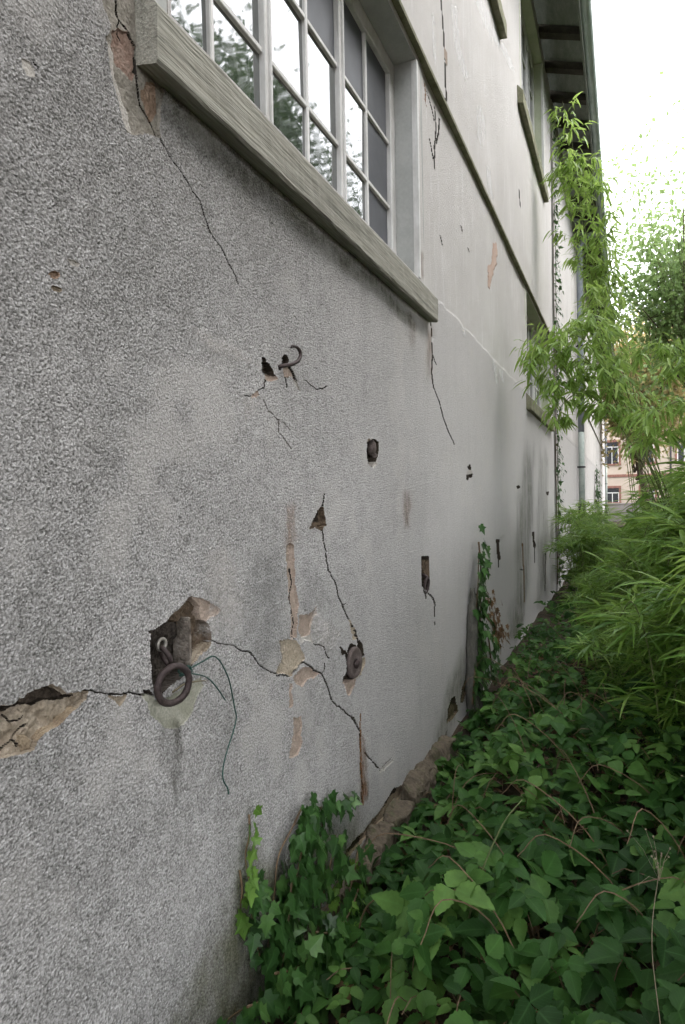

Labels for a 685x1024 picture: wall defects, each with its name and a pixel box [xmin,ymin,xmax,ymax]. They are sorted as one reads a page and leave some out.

spalling [102,0,164,138]
crack [115,1,239,284]
crack [424,0,448,169]
peeling [487,242,498,289]
crack [430,322,455,445]
spalling [0,684,89,759]
crack [76,689,153,706]
spalling [167,596,221,664]
crack [202,640,393,805]
peeling [276,543,320,758]
crack [321,529,359,642]
spalling [345,785,401,856]